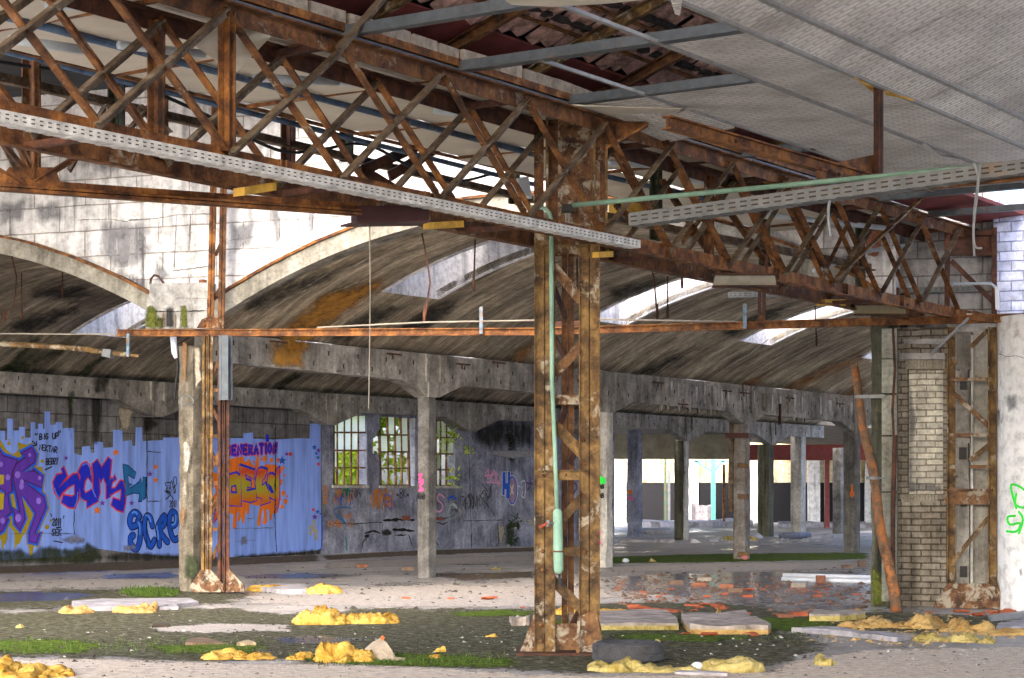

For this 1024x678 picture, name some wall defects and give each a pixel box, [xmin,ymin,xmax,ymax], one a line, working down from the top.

rust [896,177,1024,194]
leakage [3,203,22,221]
leakage [38,205,58,220]
leakage [235,224,252,249]
leakage [106,225,146,286]
rust [273,282,381,368]